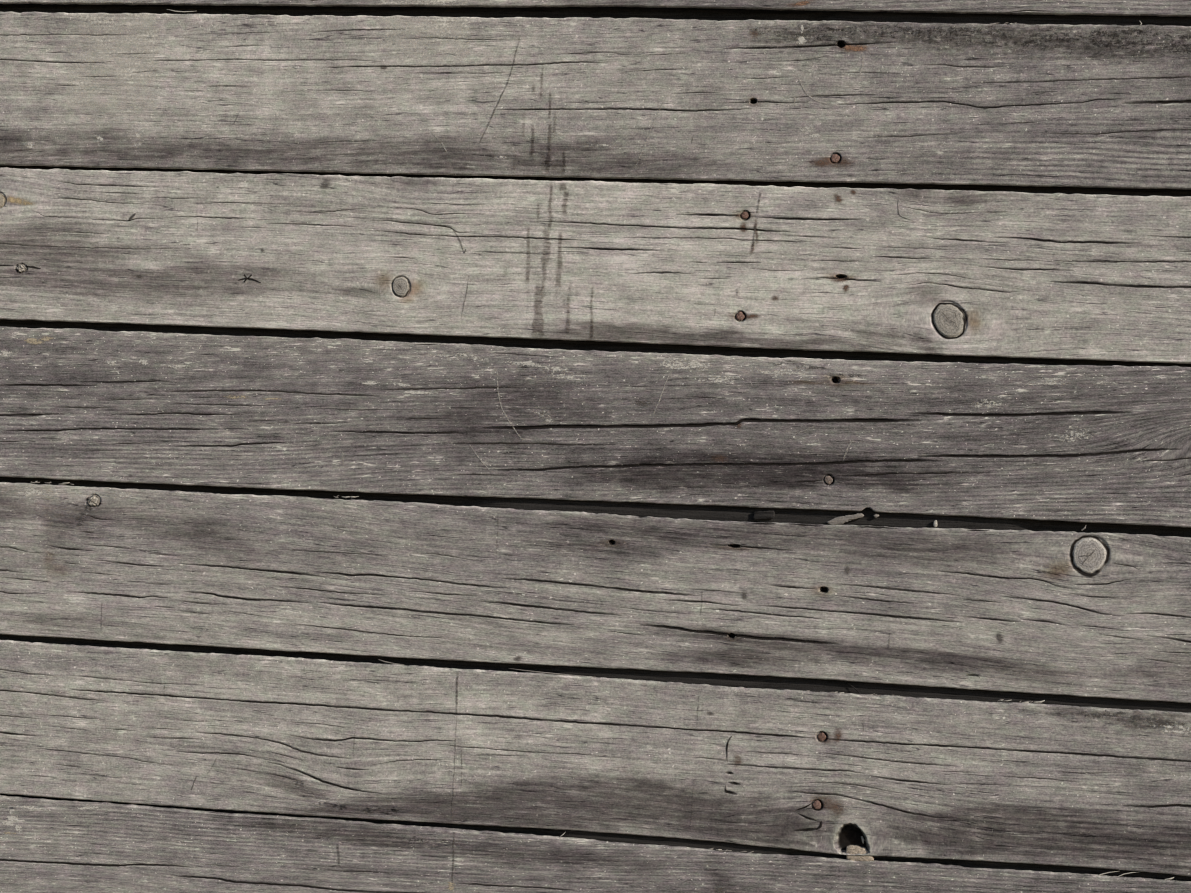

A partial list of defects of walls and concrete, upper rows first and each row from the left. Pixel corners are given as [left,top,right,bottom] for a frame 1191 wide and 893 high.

crack [0,182,352,273]
crack [238,274,261,283]
crack [384,203,1191,339]
crack [0,380,1191,482]
crack [0,669,1191,831]